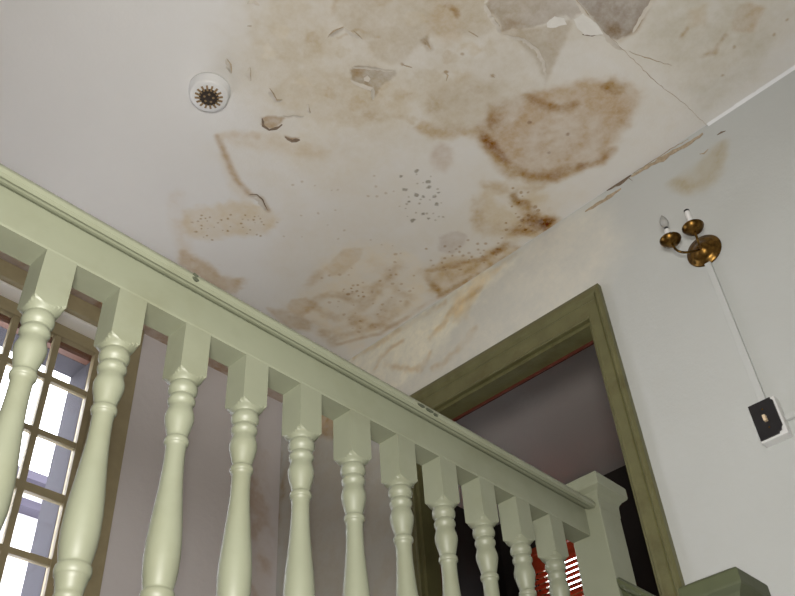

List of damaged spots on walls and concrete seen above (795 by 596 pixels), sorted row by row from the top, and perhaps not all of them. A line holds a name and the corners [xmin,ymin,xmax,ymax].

peeling [242,0,655,143]
leakage [161,0,795,396]
leakage [0,251,30,272]
leakage [70,287,102,309]
leakage [143,324,168,345]
leakage [267,388,283,403]